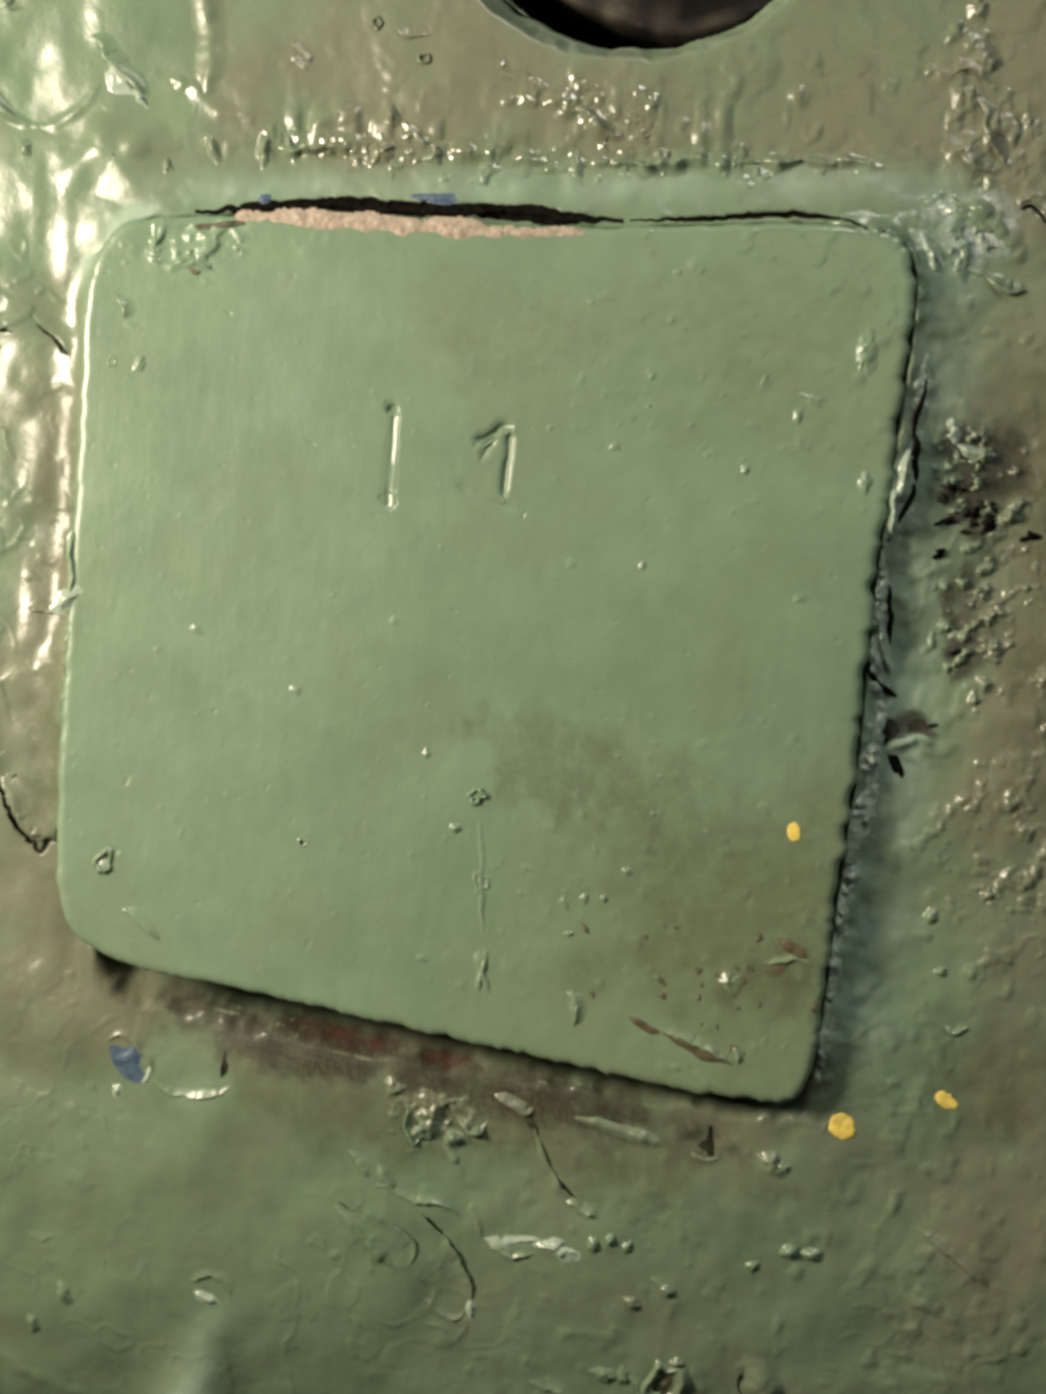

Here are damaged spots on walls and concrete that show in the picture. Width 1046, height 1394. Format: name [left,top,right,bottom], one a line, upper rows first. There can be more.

spalling [370,16,434,65]
spalling [144,193,586,275]
spalling [113,291,136,319]
crack [0,750,57,853]
peeling [755,1150,792,1180]
peeling [334,1150,633,1321]
peeling [744,1260,761,1274]
peeling [778,1243,825,1264]
peeling [621,1295,643,1312]
peeling [649,1276,679,1300]
spalling [637,1355,692,1394]
peeling [738,1356,786,1394]